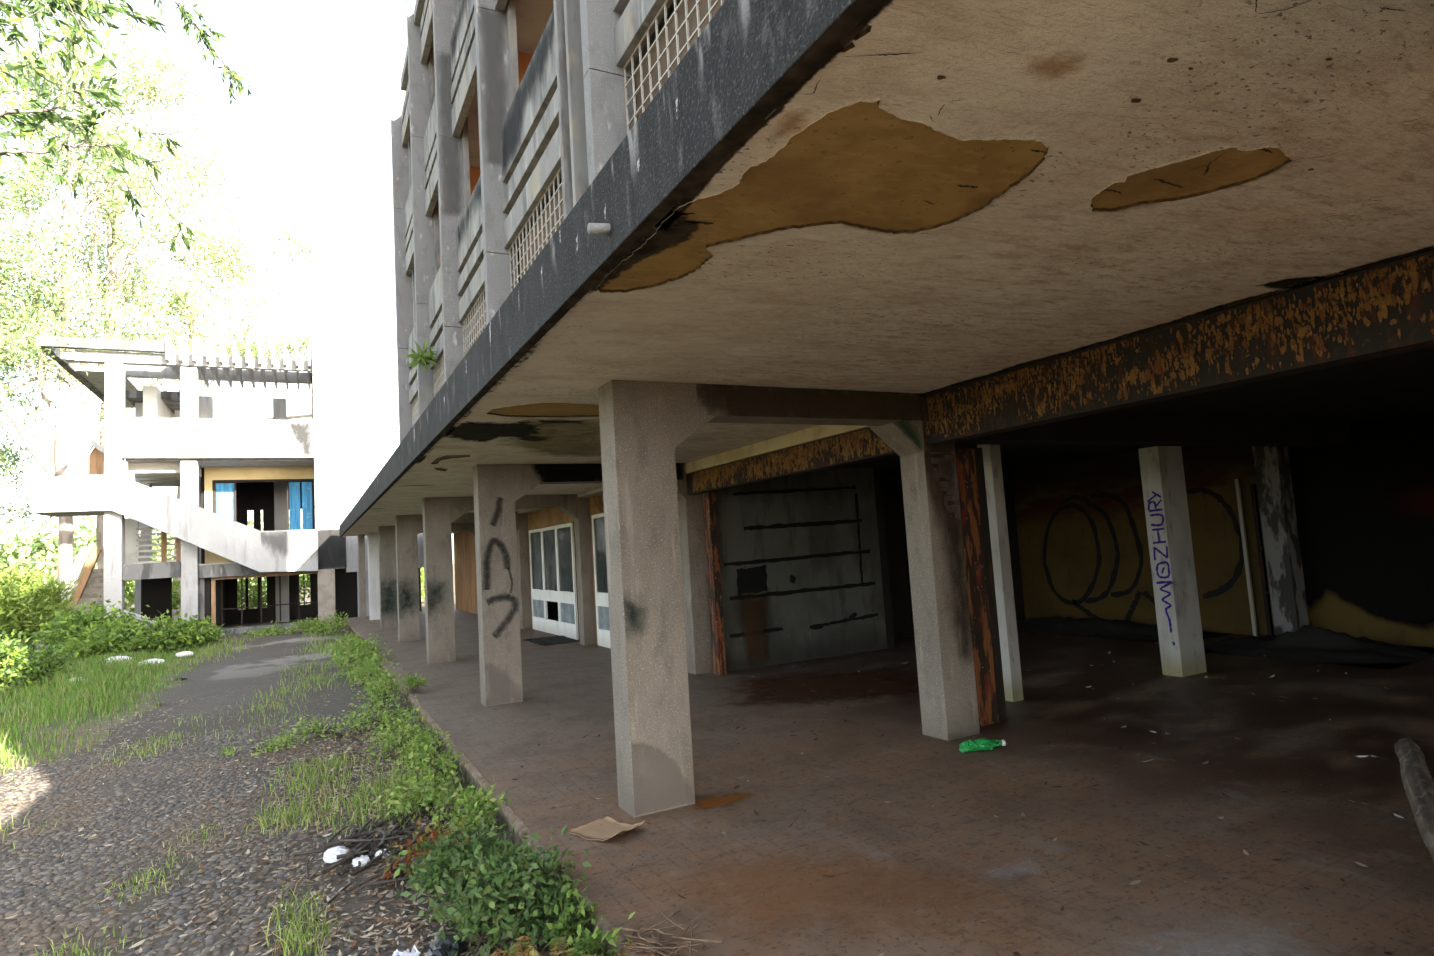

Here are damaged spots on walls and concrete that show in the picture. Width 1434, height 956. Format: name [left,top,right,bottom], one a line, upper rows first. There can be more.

peeling [597,96,1049,294]
peeling [1089,146,1314,213]
damp [261,0,893,569]
peeling [485,402,599,418]
damp [698,383,929,421]